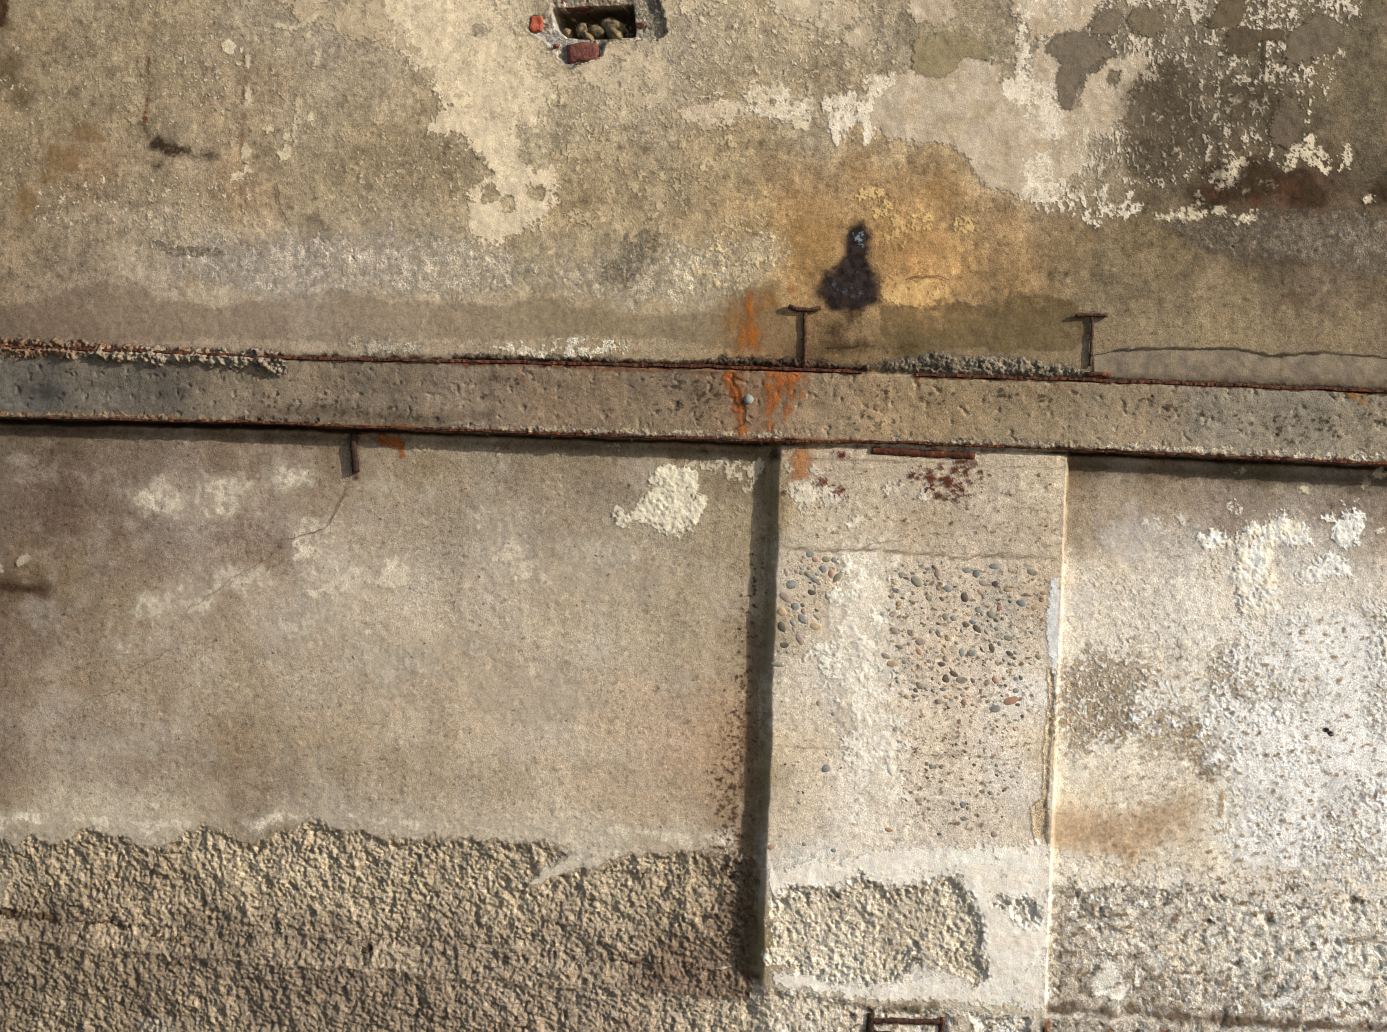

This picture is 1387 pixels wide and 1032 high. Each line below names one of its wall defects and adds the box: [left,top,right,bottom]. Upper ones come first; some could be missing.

peeling [0,0,1387,313]
spalling [339,330,430,356]
rust [267,353,1168,504]
rust [1188,451,1387,469]